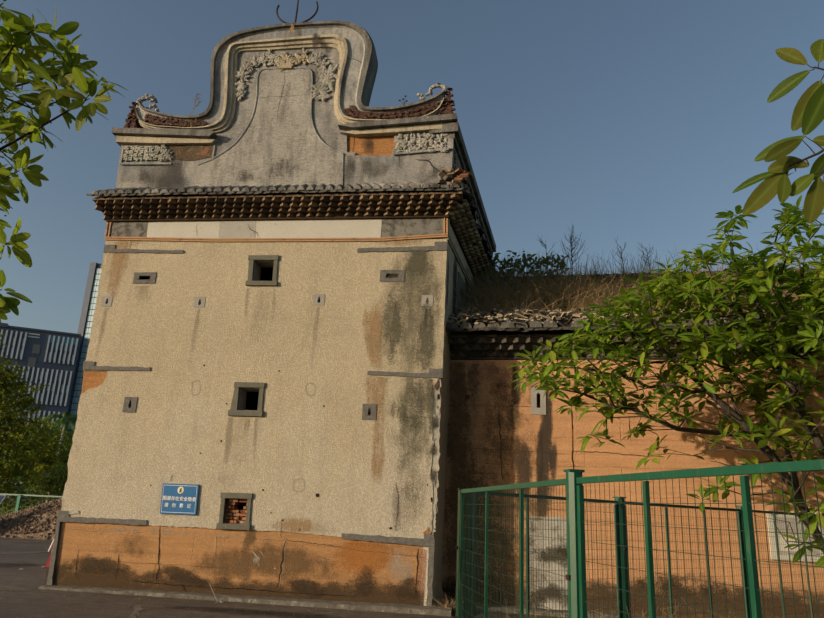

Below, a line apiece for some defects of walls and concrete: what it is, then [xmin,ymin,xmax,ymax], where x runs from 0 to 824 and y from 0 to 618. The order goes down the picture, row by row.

spalling [347,136,396,156]
damp [384,304,400,353]
damp [417,308,433,367]
spalling [81,371,107,394]
damp [412,379,437,428]
damp [442,362,567,607]
crack [138,529,185,589]
damp [44,531,424,606]
crack [209,521,345,596]
damp [586,580,618,613]
damp [630,574,745,618]
damp [760,587,824,618]